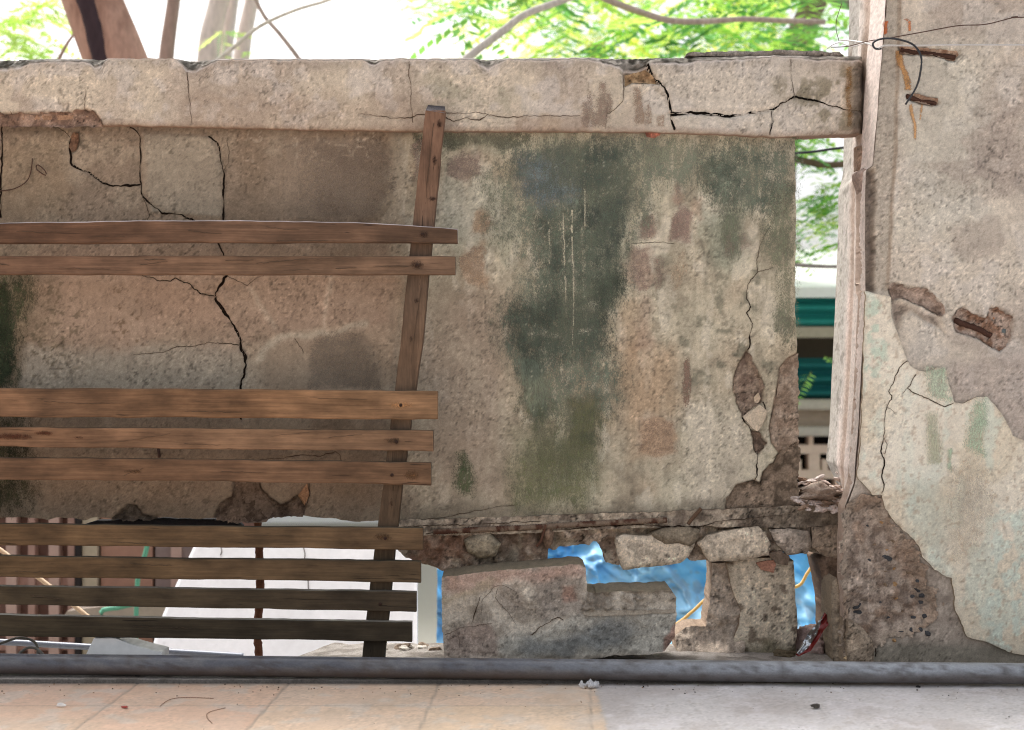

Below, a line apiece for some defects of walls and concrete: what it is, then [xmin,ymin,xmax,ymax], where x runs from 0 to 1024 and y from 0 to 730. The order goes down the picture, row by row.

crack [646,63,861,134]
rust [896,50,911,90]
crack [0,126,8,218]
crack [53,126,195,221]
crack [134,73,261,389]
damp [548,184,603,346]
spalling [889,282,1013,351]
damp [682,359,691,408]
spalling [726,352,801,514]
crack [880,361,953,492]
spalling [214,482,309,524]
spalling [838,494,944,660]